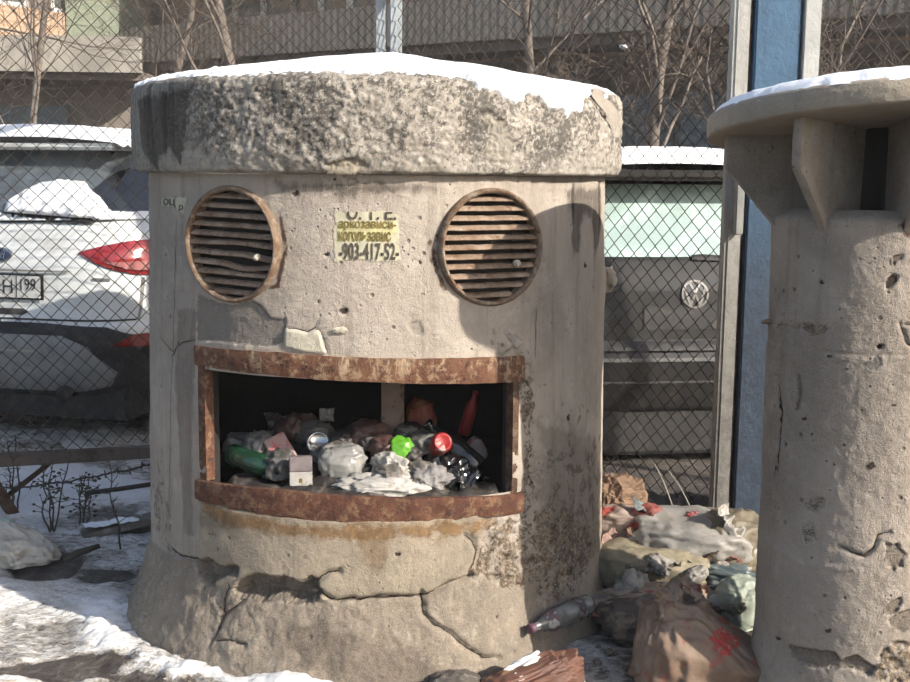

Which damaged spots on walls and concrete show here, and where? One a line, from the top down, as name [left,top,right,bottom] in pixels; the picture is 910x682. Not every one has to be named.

spalling [591,87,621,138]
crack [774,386,783,475]
spalling [464,367,591,601]
rust [204,503,494,540]
crack [212,587,246,645]
spalling [196,558,323,604]
crack [319,535,497,658]
spalling [788,597,910,682]
spalling [885,543,907,571]